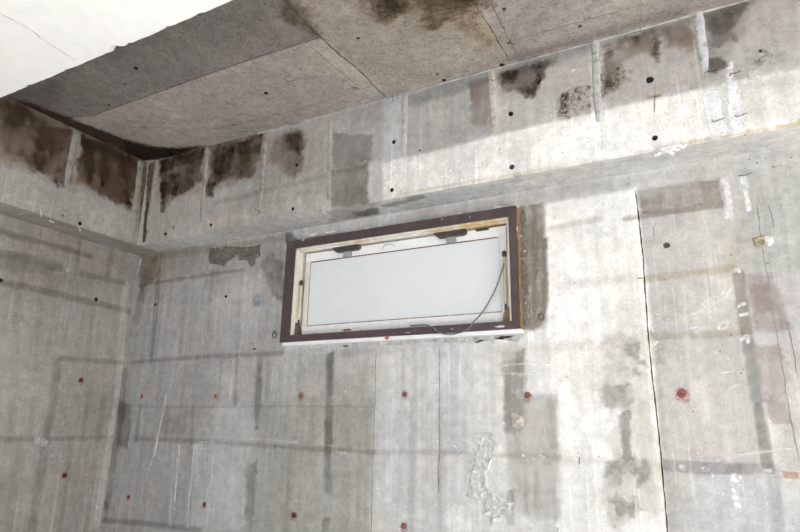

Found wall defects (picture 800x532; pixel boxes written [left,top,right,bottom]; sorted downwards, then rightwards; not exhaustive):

water stain [359,0,477,31]
water stain [503,62,549,98]
water stain [2,101,66,184]
water stain [285,133,305,171]
water stain [77,134,263,212]
peeling [208,244,261,267]
spalling [466,432,514,527]